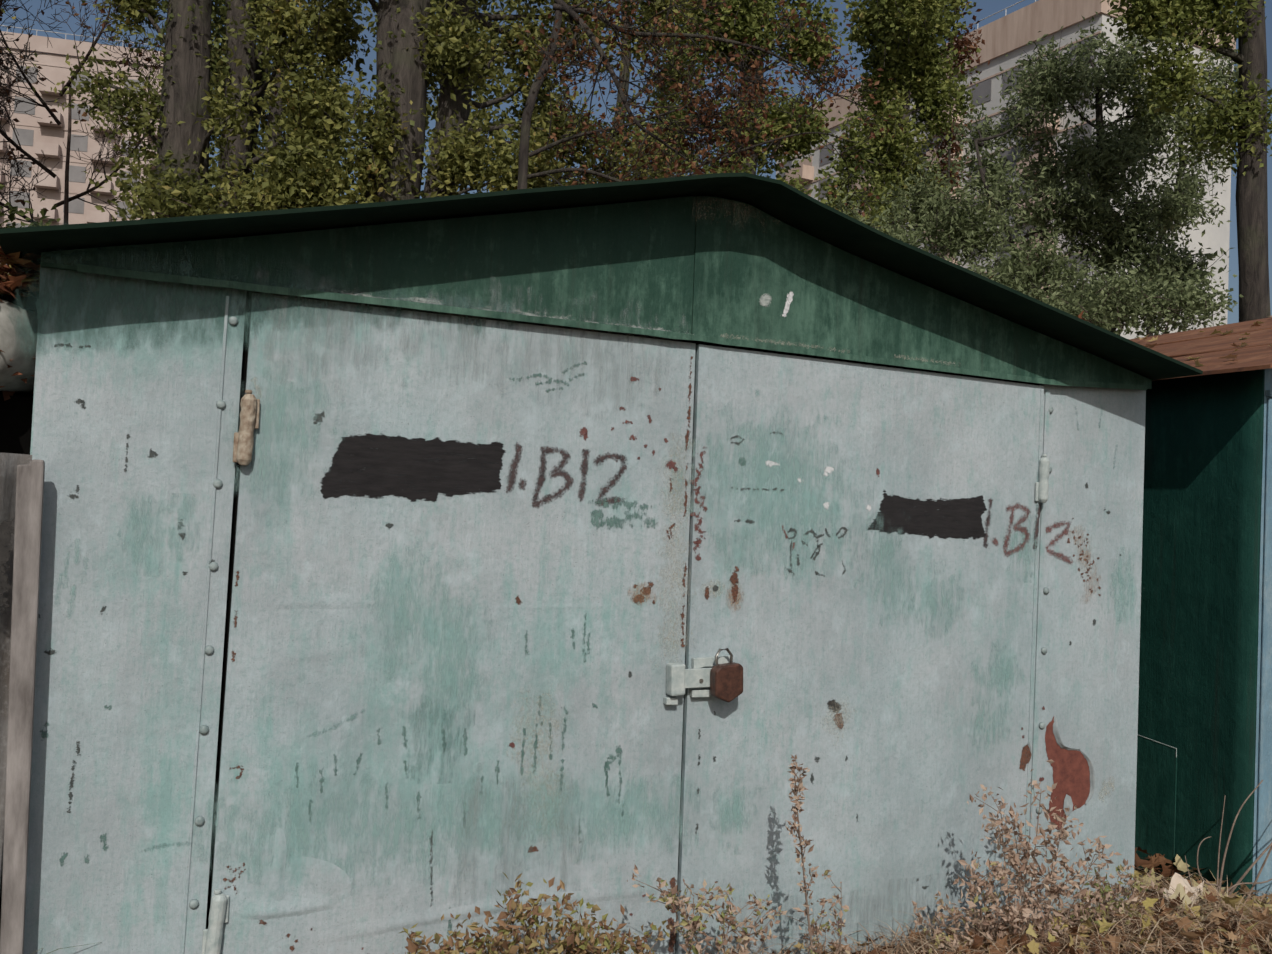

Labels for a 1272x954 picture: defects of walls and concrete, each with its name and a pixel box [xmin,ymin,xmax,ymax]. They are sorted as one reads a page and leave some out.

rust [680,356,707,647]
leakage [0,518,15,612]
rust [633,581,655,604]
rust [729,566,739,604]
rust [1067,518,1101,596]
rust [833,712,844,729]
peeling [1019,706,1095,830]